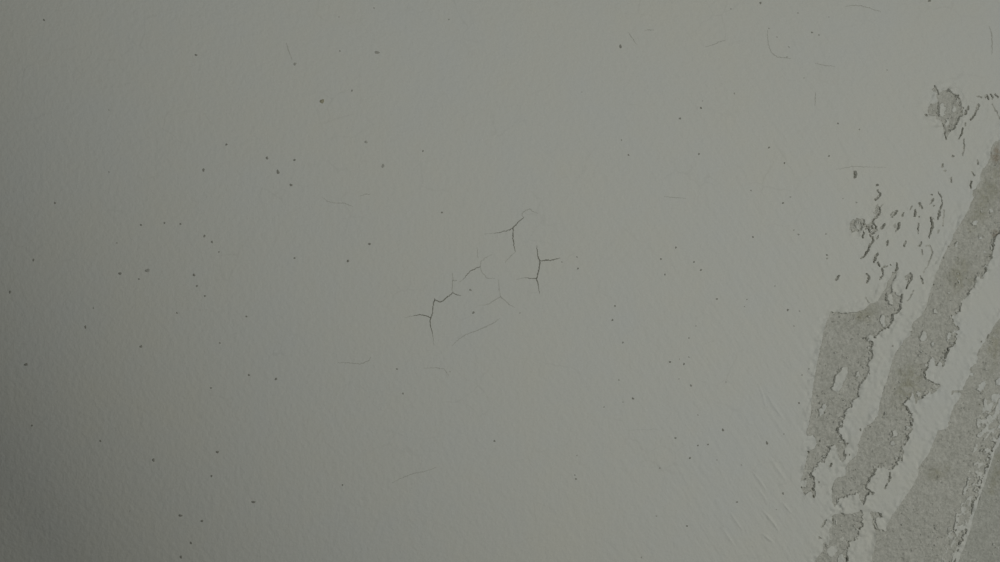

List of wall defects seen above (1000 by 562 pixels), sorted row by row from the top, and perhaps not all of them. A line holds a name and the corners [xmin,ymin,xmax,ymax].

peeling [924,85,1000,183]
crack [409,209,559,376]
peeling [801,140,1000,562]